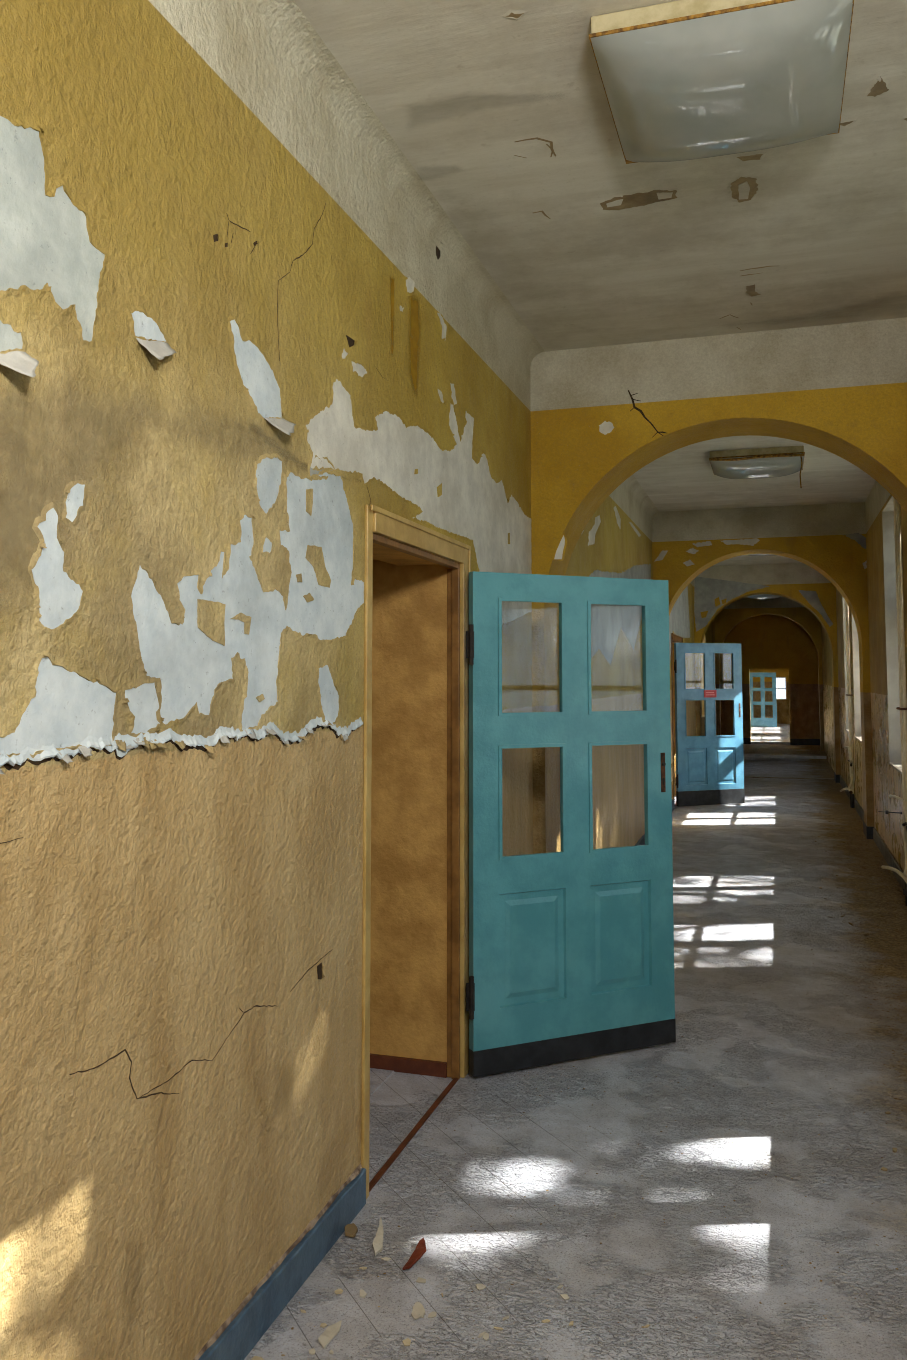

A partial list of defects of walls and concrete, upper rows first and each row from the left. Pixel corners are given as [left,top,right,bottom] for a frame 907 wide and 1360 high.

peeling [864,74,893,98]
peeling [597,188,681,211]
peeling [727,152,767,204]
peeling [0,110,108,377]
crack [226,213,256,254]
crack [277,203,326,361]
peeling [127,305,177,360]
crack [628,390,666,438]
peeling [0,315,532,774]
peeling [587,537,771,667]
peeling [798,589,834,628]
crack [70,949,333,1099]